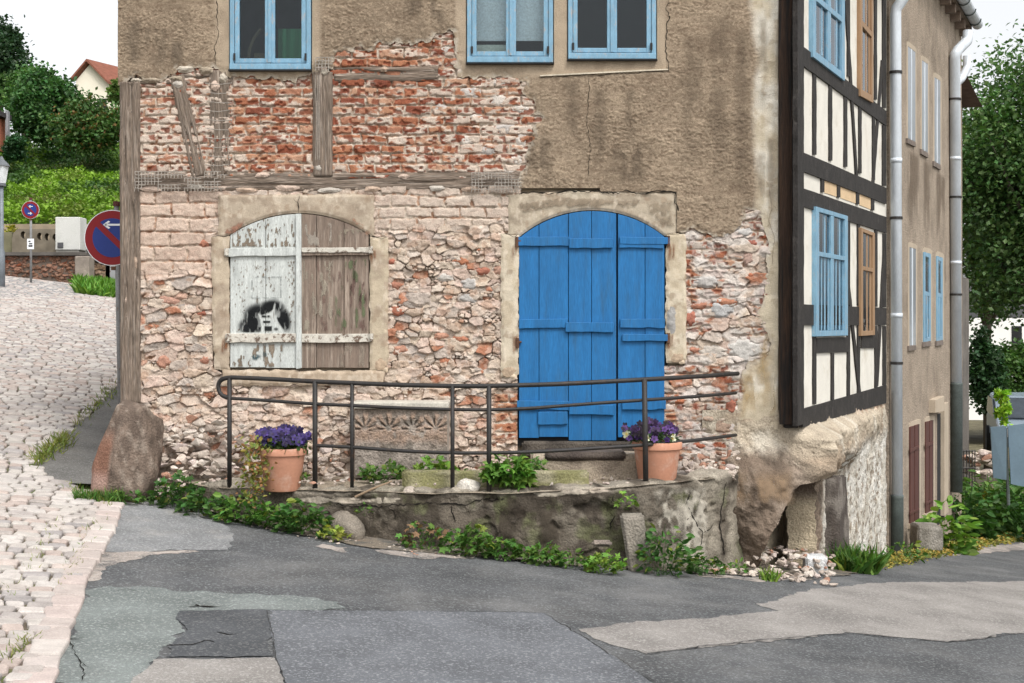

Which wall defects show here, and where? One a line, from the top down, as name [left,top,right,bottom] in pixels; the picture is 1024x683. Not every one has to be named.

crack [520,3,684,235]
flaking render [131,30,543,497]
flaking render [664,209,771,475]
crack [683,482,727,555]